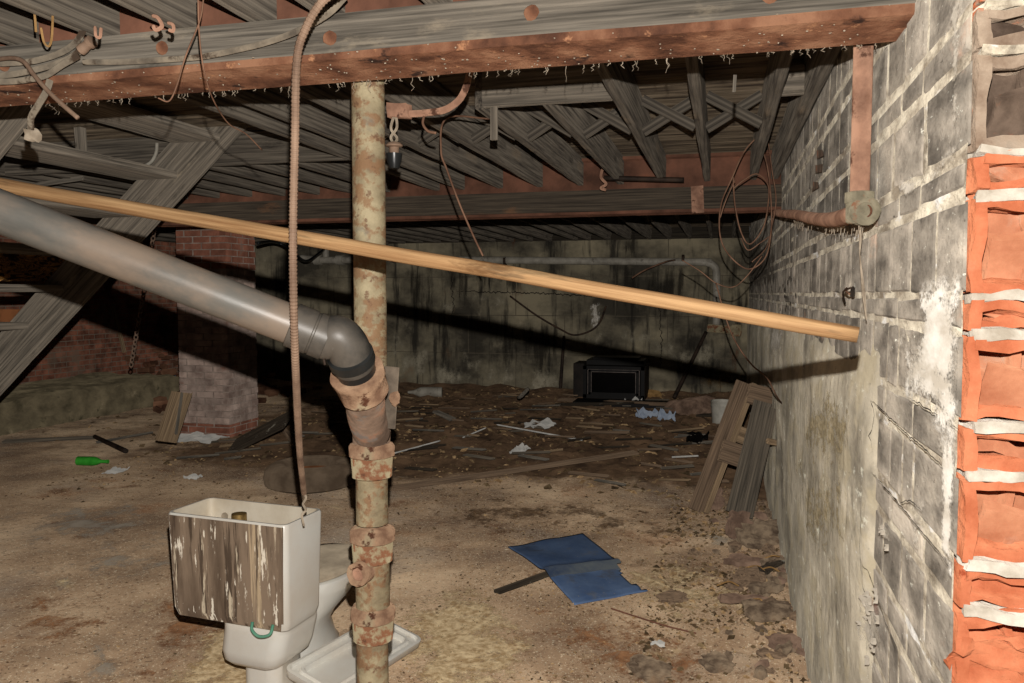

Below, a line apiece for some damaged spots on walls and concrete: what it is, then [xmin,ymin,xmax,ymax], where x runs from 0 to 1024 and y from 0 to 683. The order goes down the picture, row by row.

crack [860,400,942,466]
damp [898,277,960,575]